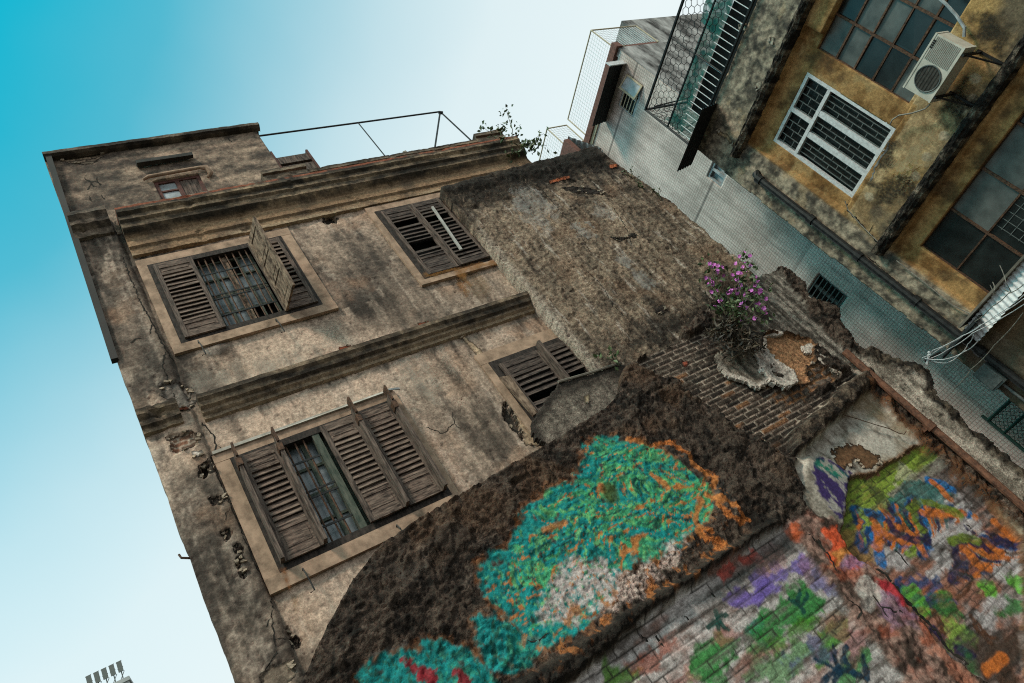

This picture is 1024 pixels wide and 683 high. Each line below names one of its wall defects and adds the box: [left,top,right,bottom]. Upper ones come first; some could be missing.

water stain [969,12,1008,57]
crack [84,178,105,201]
water stain [868,142,915,203]
crack [122,256,177,400]
spalling [158,378,197,411]
flaking render [634,327,862,459]
spalling [502,402,538,446]
spalling [165,429,216,479]
spalling [830,443,883,470]
spalling [208,492,228,506]
spalling [220,528,248,579]